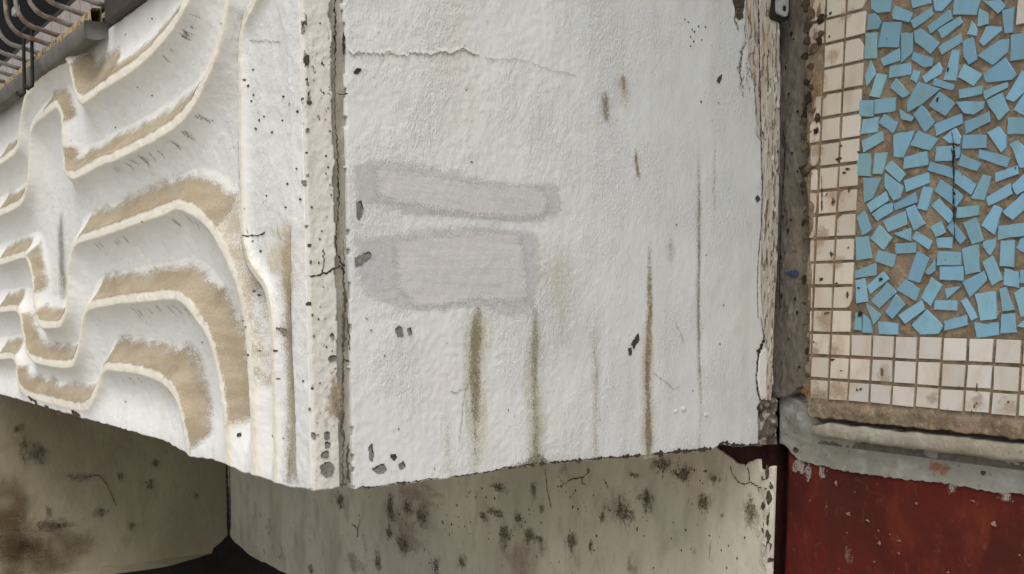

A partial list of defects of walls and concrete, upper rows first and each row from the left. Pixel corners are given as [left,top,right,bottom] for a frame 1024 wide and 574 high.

crack [290,0,576,487]
peeling [733,0,832,447]
damp [0,483,88,574]
spalling [368,443,406,474]
damp [387,491,426,553]
damp [469,307,482,455]
damp [442,484,544,545]
damp [531,315,539,466]
damp [599,490,653,537]
damp [645,248,716,482]